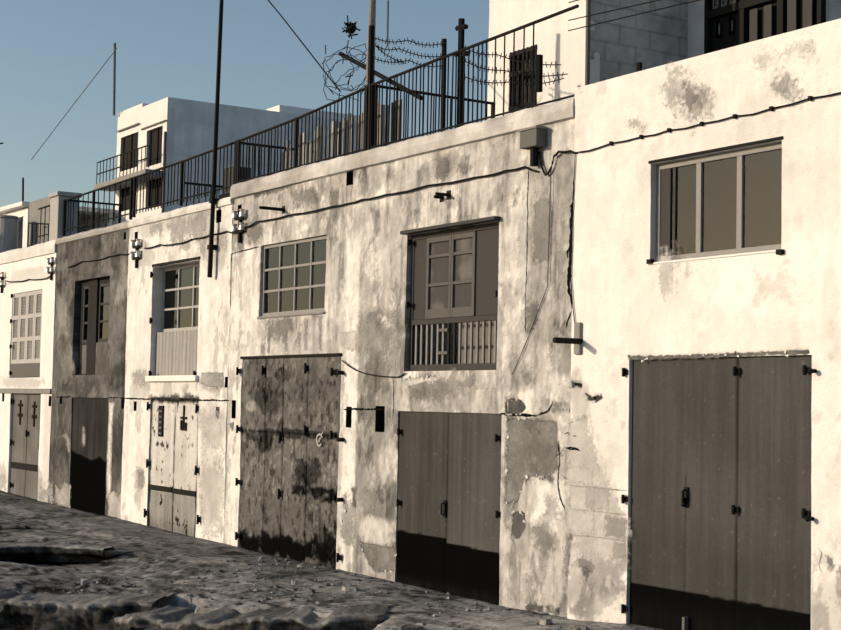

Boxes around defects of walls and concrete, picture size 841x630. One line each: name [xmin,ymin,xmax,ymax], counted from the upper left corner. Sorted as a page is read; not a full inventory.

water stain [663,66,712,118]
water stain [771,73,802,102]
peeling [503,397,630,567]